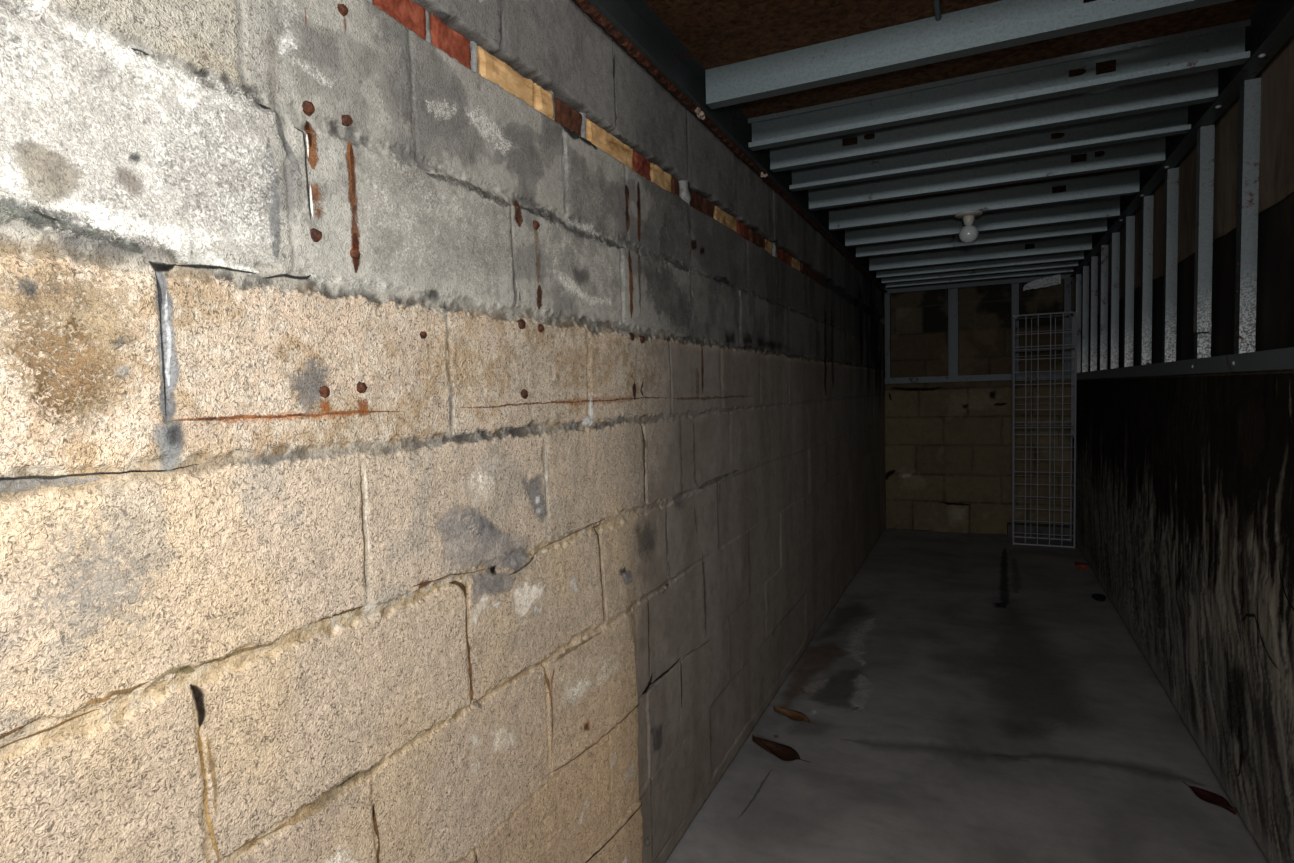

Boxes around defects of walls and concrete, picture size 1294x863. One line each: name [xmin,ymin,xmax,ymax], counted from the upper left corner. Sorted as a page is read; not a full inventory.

crack [0,30,314,424]
corrosion [304,121,322,217]
corrosion [345,141,360,273]
water stain [0,263,136,425]
corrosion [166,399,397,422]
crack [0,464,197,492]
water stain [461,458,499,508]
crack [320,606,363,621]
water stain [1073,373,1294,776]
crack [0,640,380,863]
crack [586,793,646,863]